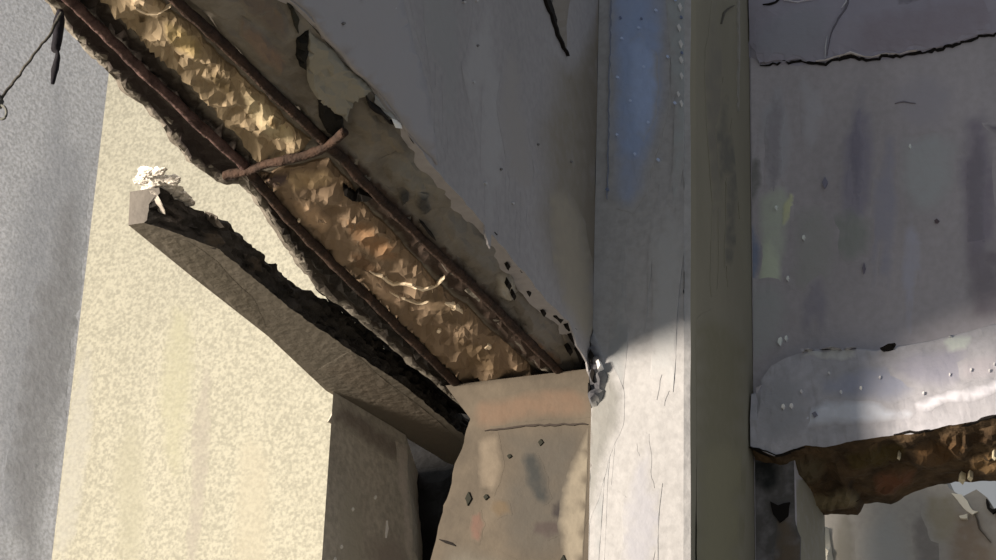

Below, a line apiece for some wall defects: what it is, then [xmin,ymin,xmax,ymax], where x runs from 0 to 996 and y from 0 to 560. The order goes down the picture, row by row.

spalling [62,0,607,408]
corrosion [198,29,563,374]
crack [543,0,570,56]
leakage [748,0,996,447]
crack [760,0,996,66]